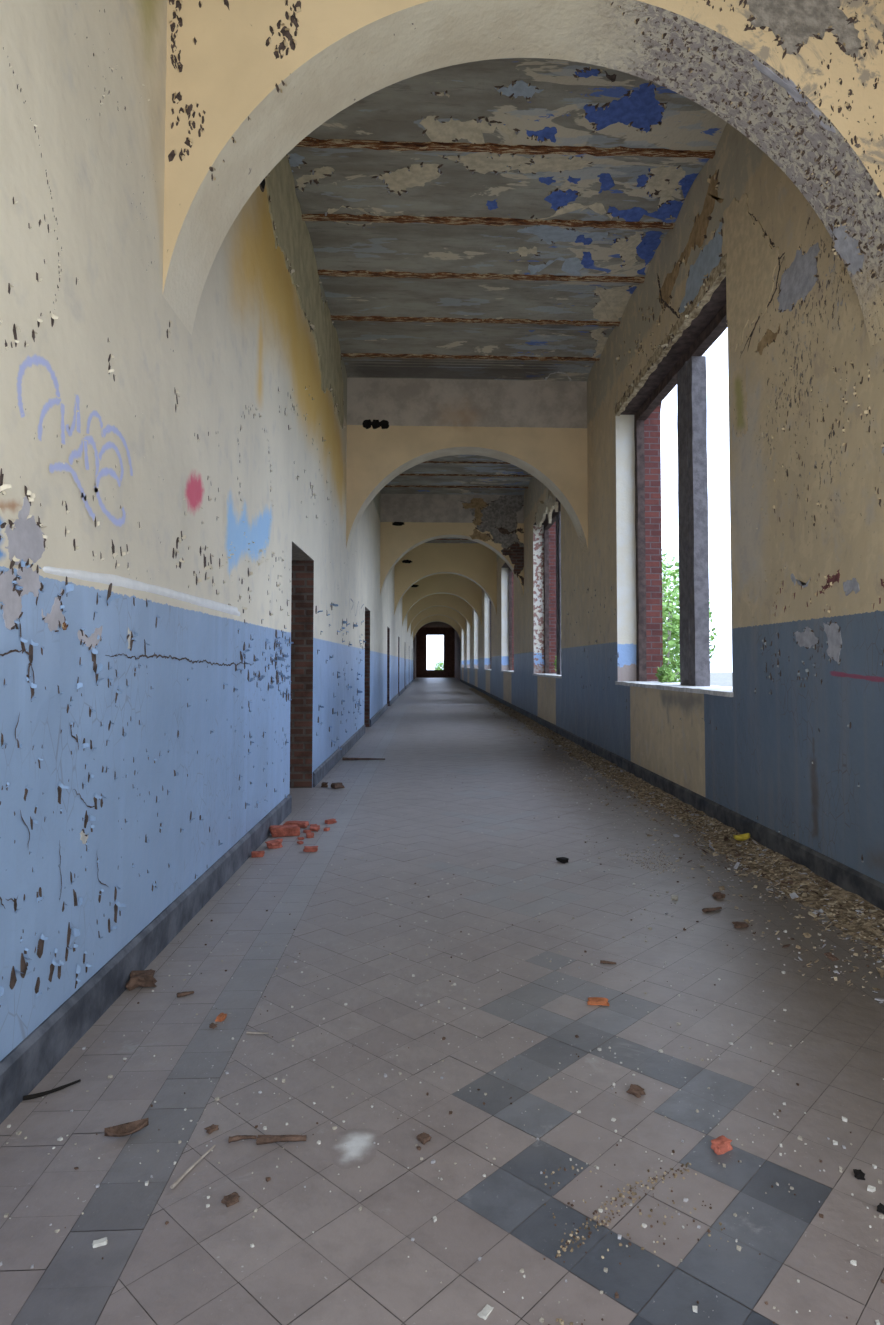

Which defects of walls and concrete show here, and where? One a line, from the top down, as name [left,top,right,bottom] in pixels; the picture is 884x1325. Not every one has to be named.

peeling [169,0,197,72]
peeling [265,0,302,59]
peeling [168,92,206,162]
peeling [495,80,544,101]
peeling [573,67,668,133]
flaking render [610,0,884,355]
peeling [372,115,724,409]
flaking render [265,153,345,518]
flaking render [458,488,558,586]
crack [105,652,254,666]
peeling [745,566,860,688]
flaking render [0,468,188,1007]